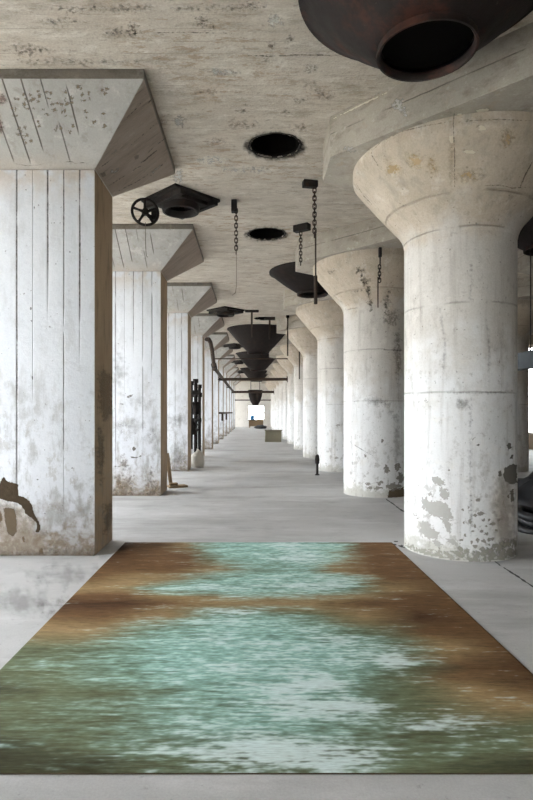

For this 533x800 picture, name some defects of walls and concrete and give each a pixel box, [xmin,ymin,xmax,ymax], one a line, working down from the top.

spalling [0,477,40,542]
peeling [365,463,404,498]
peeling [415,476,499,551]
peeling [498,443,518,502]